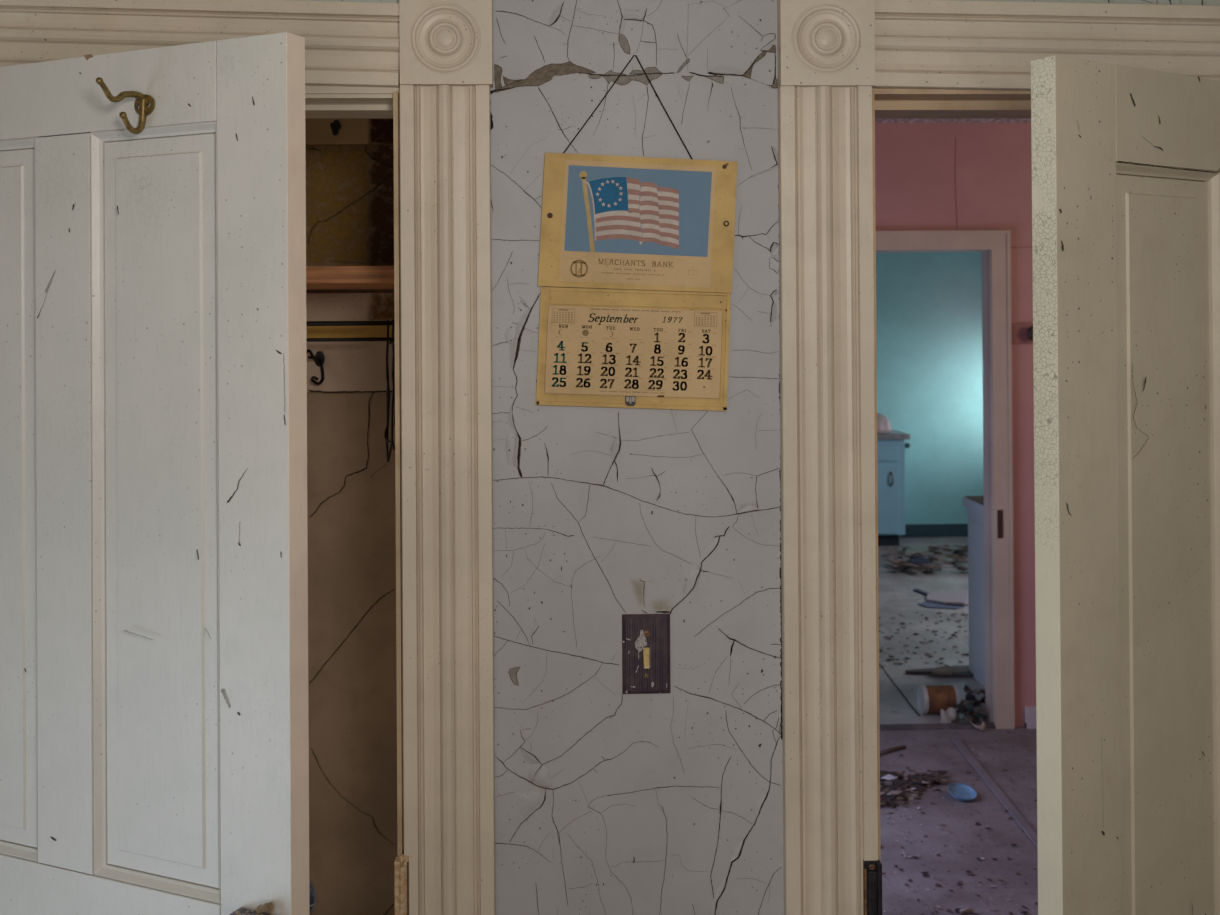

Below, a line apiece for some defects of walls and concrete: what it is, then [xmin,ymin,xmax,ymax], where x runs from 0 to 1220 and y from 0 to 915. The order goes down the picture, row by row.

spalling [494,58,724,93]
spalling [618,33,630,54]
spalling [743,45,776,79]
crack [309,393,388,518]
crack [490,0,781,915]
crack [309,589,395,684]
crack [310,747,394,845]